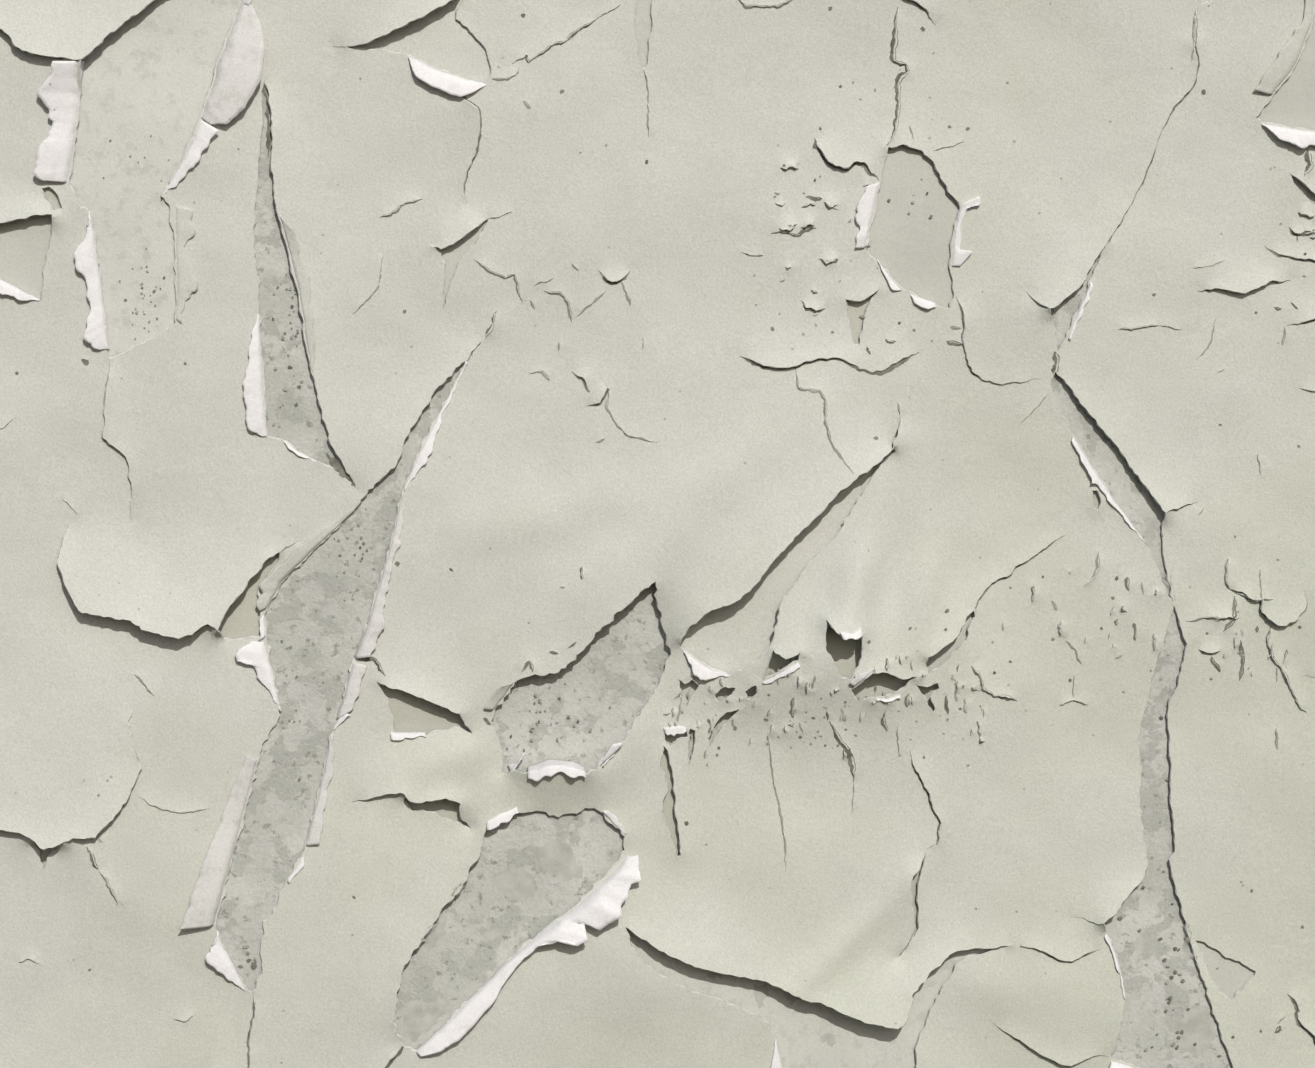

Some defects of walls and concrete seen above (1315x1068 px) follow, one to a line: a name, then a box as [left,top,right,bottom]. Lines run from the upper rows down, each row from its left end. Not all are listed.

peeling [0,0,265,513]
peeling [321,0,641,322]
peeling [57,72,981,992]
peeling [940,297,1030,386]
peeling [1013,347,1211,601]
peeling [1186,0,1315,350]
peeling [0,703,217,910]
peeling [332,529,1307,1068]
peeling [247,997,268,1068]